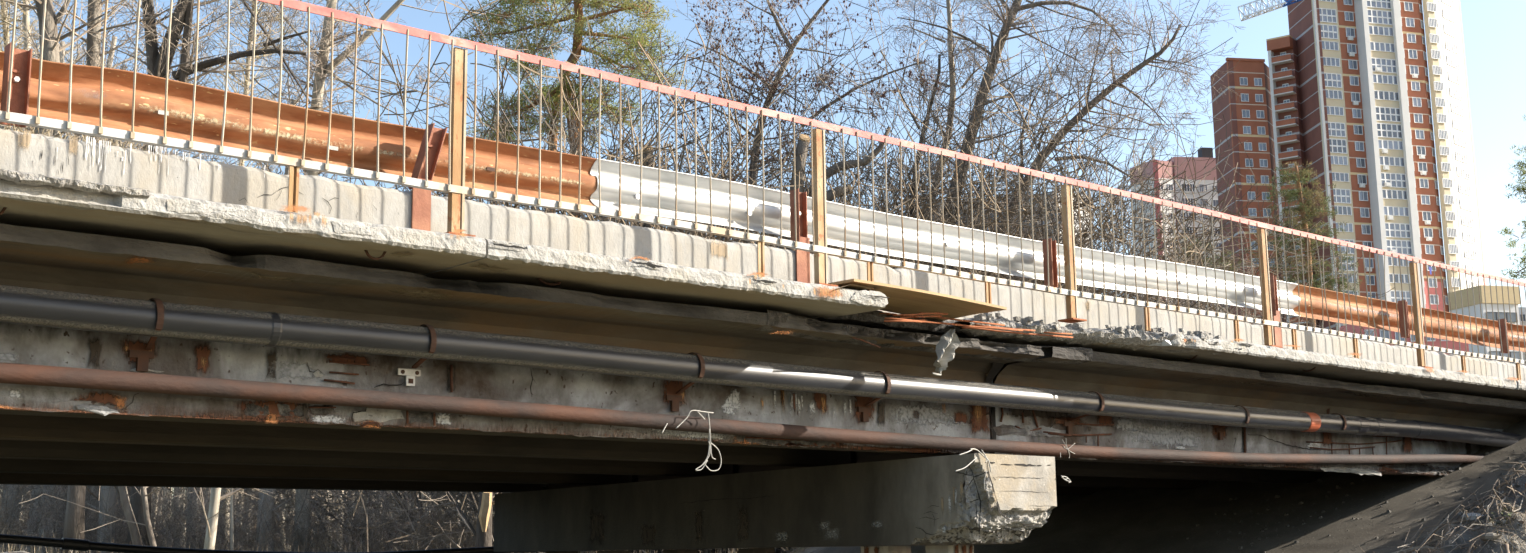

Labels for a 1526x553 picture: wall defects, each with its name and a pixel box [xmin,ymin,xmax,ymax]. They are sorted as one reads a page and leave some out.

spalling [331,221,379,236]
spalling [467,235,528,249]
spalling [635,259,666,268]
spalling [851,290,889,307]
spalling [754,310,1253,365]
rust [663,380,686,404]
rust [761,390,885,424]
spalling [985,477,997,508]